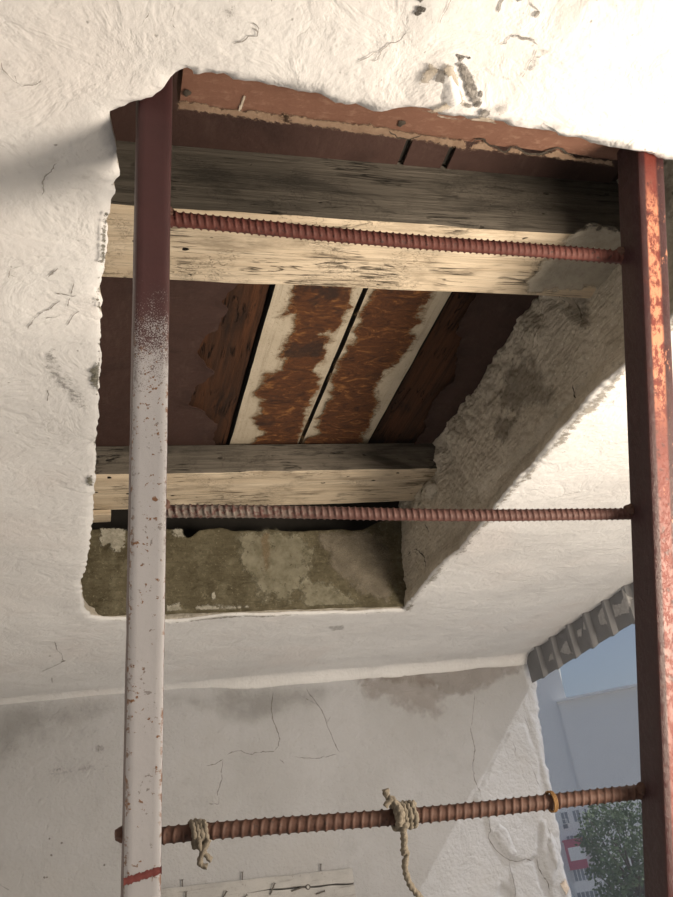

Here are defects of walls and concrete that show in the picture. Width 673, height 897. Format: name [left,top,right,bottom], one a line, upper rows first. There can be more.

crack [497,0,541,77]
spalling [421,54,496,124]
peeling [177,101,614,166]
spalling [98,212,108,263]
spalling [90,343,100,395]
peeling [251,285,434,445]
crack [208,690,339,804]